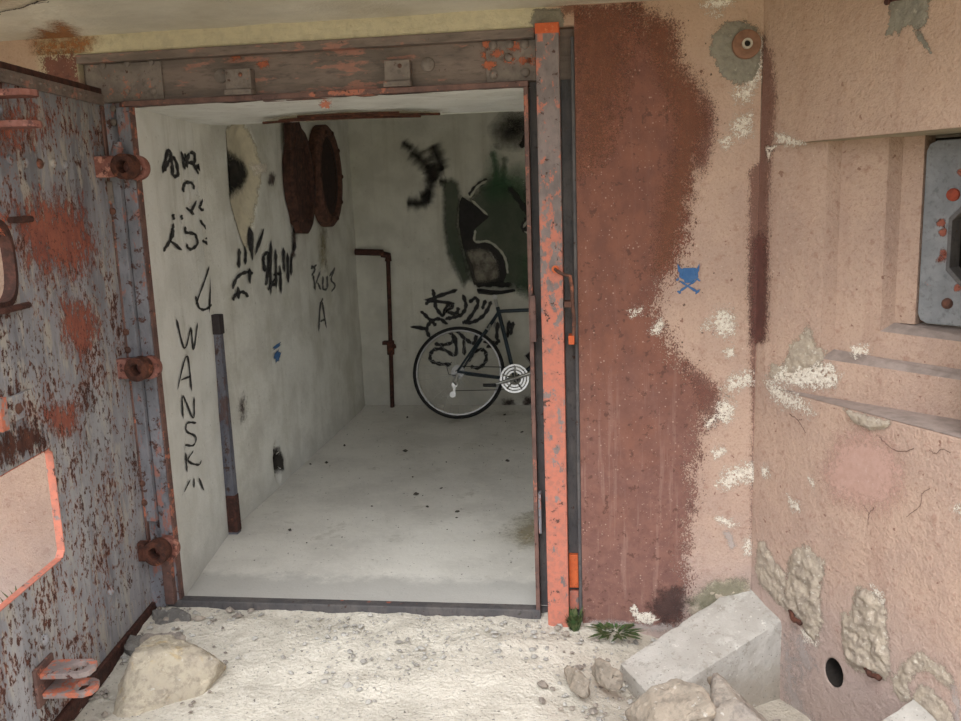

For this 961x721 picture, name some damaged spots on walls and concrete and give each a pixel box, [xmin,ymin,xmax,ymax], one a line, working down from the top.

rust [33,22,94,55]
rust [0,98,55,156]
peeling [692,37,764,174]
peeling [766,132,807,160]
rust [0,182,105,367]
leakage [745,32,778,539]
rust [0,396,82,469]